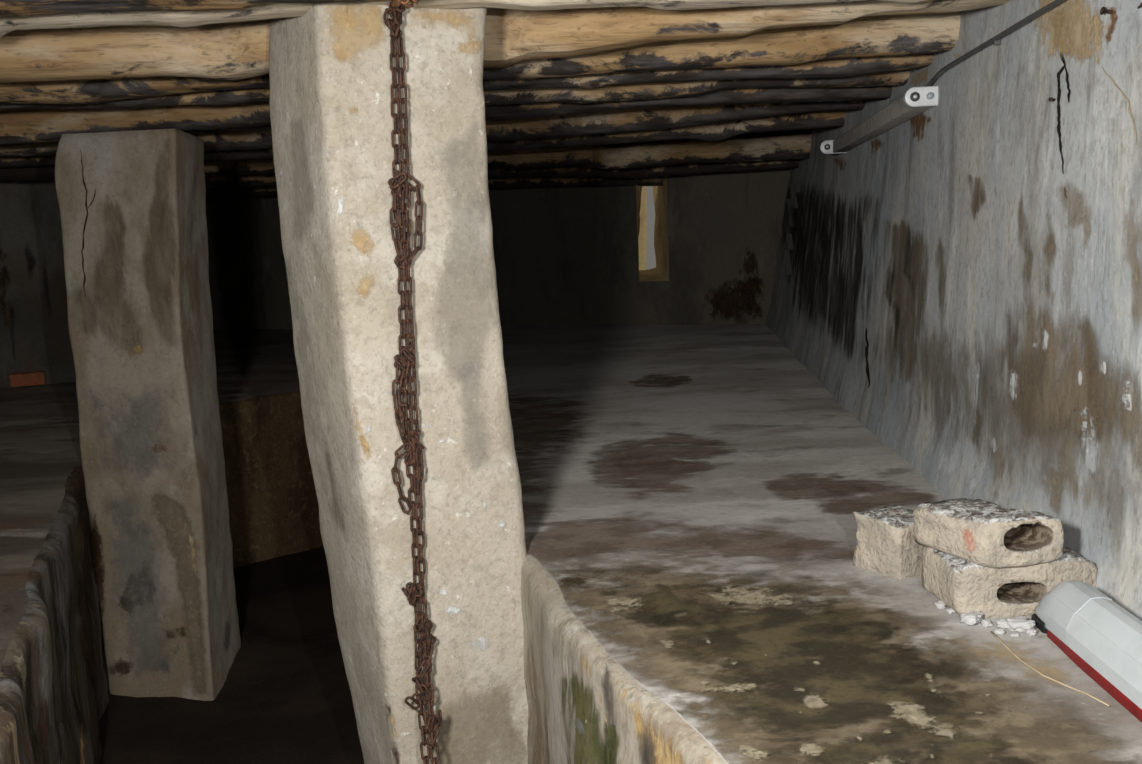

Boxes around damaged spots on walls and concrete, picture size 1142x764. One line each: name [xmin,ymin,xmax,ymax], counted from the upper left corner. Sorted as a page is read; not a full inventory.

corrosion [1106,7,1117,42]
crack [1057,45,1071,199]
crack [1102,67,1137,144]
crack [80,150,96,295]
damp [145,147,174,339]
corrosion [707,251,762,319]
damp [781,185,877,356]
damp [970,178,984,218]
damp [1018,201,1032,281]
damp [1045,189,1107,290]
damp [886,221,1142,523]
damp [508,395,1136,764]